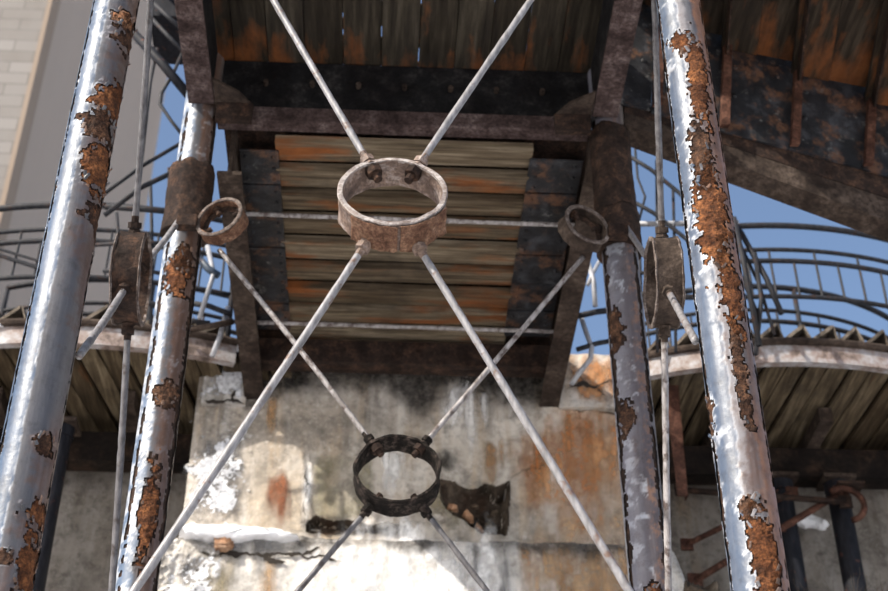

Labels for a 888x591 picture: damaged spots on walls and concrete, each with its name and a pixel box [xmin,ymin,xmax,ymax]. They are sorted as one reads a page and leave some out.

damp [449,389,486,431]
rust [268,475,287,516]
spalling [305,515,408,535]
spalling [433,479,511,536]
rust [522,411,628,591]
crack [195,547,343,572]